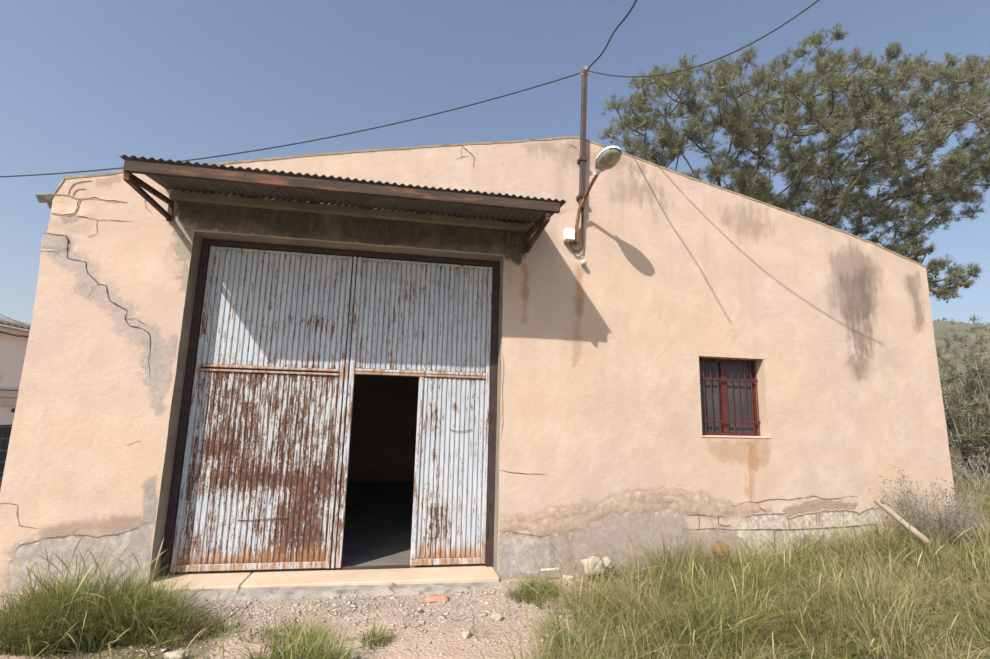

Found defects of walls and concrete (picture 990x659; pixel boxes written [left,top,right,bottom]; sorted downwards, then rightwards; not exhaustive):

crack [47,180,151,373]
flaking render [4,522,150,594]
flaking render [732,499,883,556]